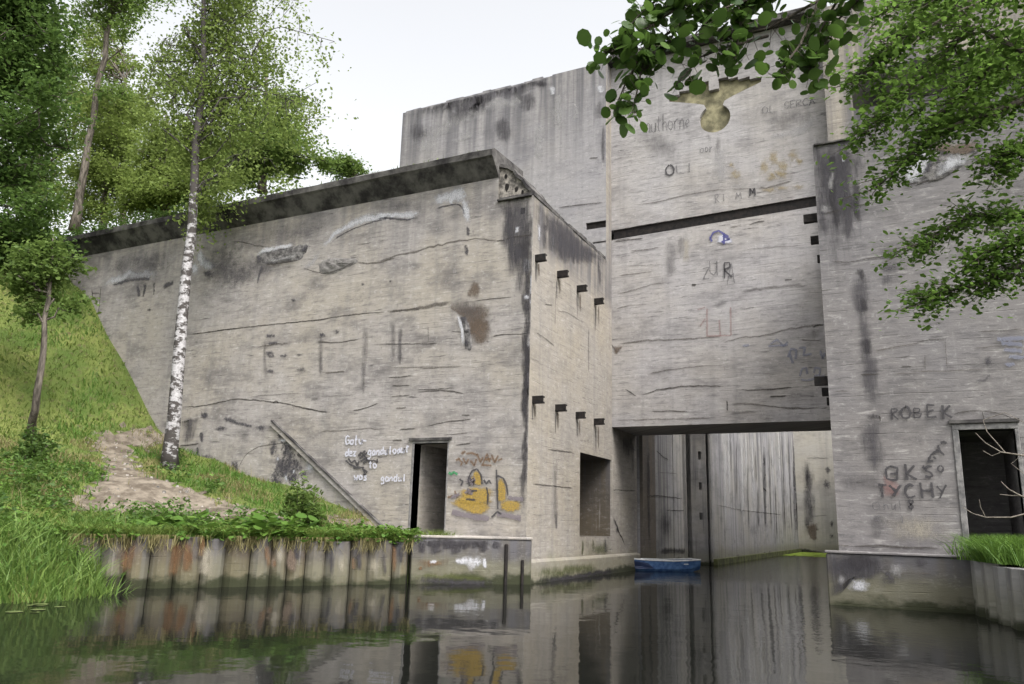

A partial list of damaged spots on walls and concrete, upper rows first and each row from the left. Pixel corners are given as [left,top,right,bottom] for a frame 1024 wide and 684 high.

water stain [817,150,860,233]
spalling [257,244,309,283]
crack [362,235,530,264]
crack [194,302,447,343]
water stain [453,283,488,343]
water stain [503,196,601,489]
water stain [856,269,876,394]
crack [189,331,470,445]
water stain [731,444,831,539]